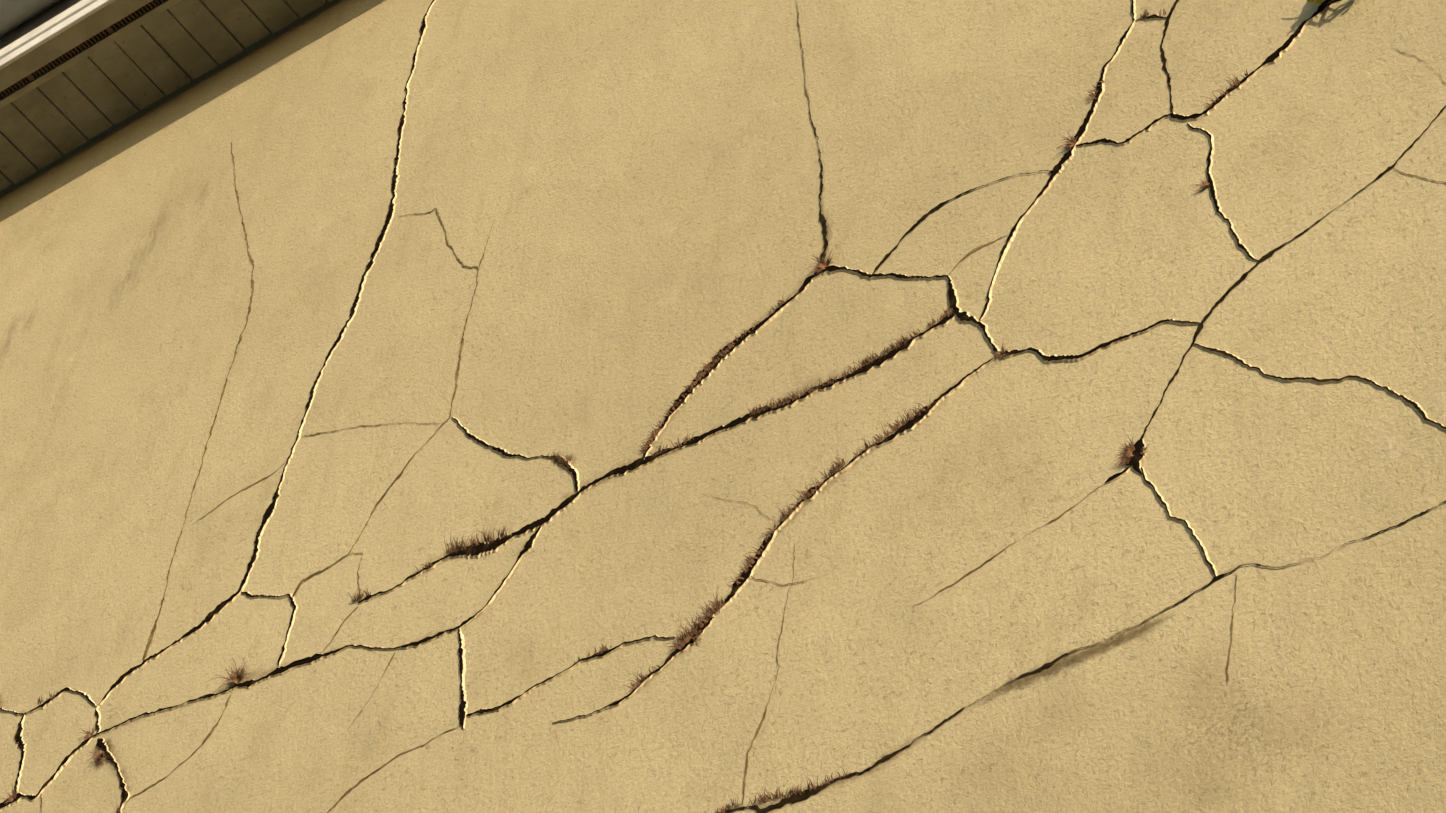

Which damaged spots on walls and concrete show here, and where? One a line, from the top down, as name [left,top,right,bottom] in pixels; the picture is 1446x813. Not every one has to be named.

crack [0,0,997,813]
crack [348,80,1446,606]
crack [715,467,1446,813]
crack [949,0,1331,320]